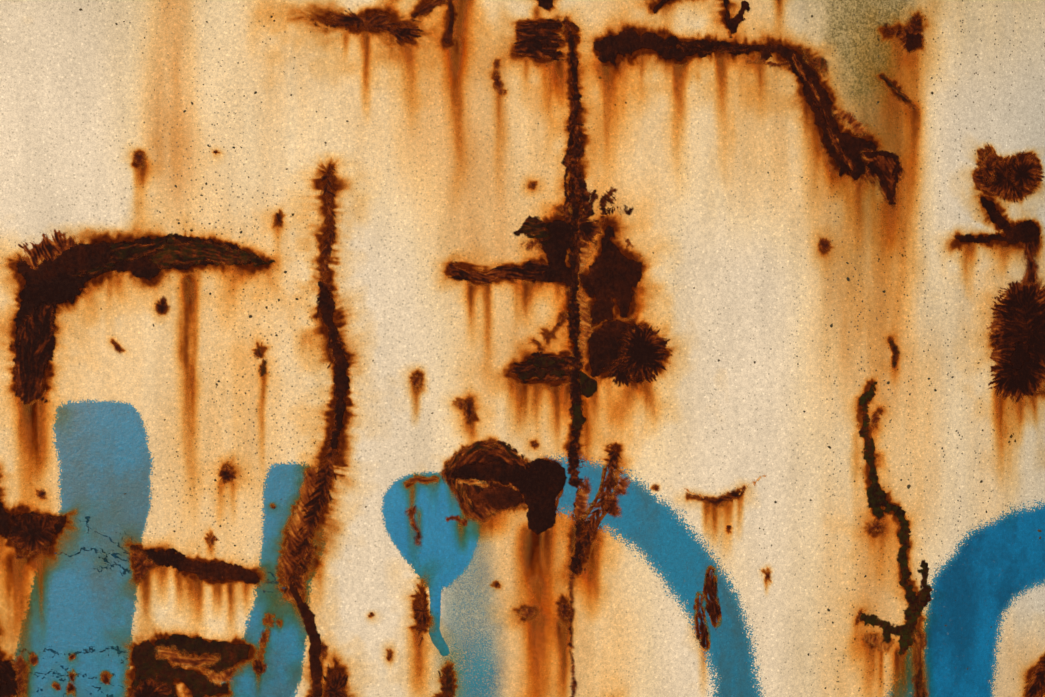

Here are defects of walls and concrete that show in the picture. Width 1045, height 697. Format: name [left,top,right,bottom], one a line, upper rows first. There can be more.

rust [296,4,426,76]
rust [509,0,580,83]
rust [592,24,903,205]
rust [7,229,275,465]
rust [444,187,672,421]
rust [949,143,1045,431]
rust [0,473,75,603]
rust [126,467,319,606]
rust [404,396,571,669]
rust [125,614,282,697]
rust [306,642,353,697]
rust [1023,654,1045,697]